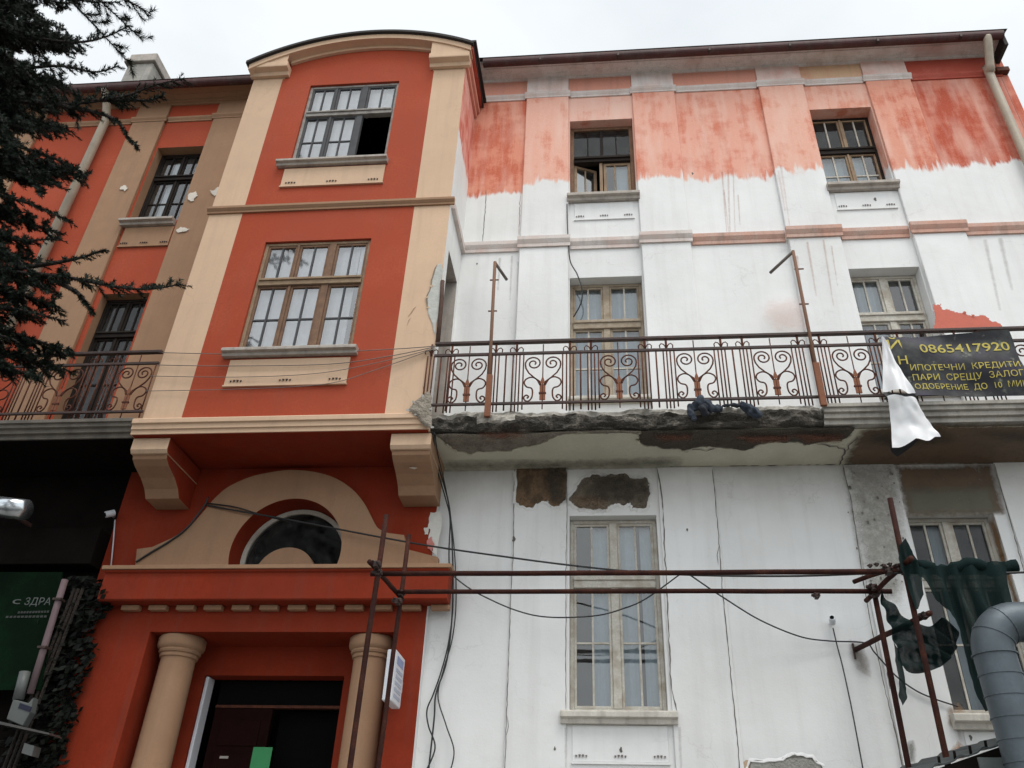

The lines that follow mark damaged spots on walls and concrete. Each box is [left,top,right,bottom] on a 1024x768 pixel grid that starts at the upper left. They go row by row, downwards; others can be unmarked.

flaking render [425,264,443,333]
peeling [933,304,1002,328]
spalling [406,389,855,455]
flaking render [512,468,655,514]